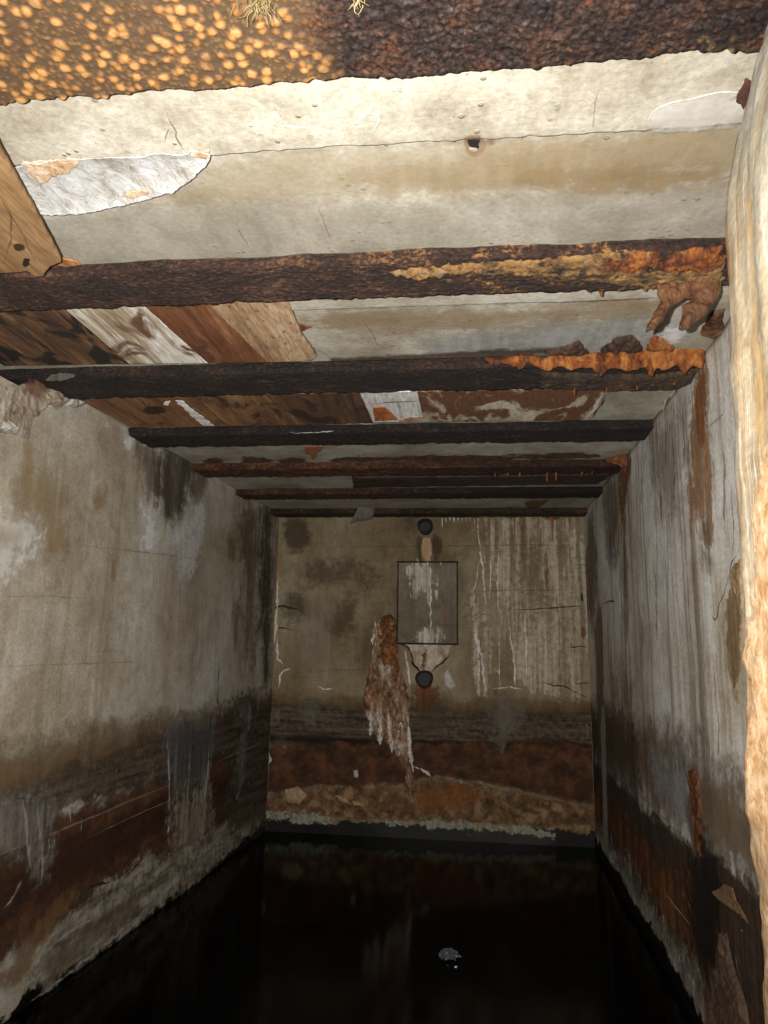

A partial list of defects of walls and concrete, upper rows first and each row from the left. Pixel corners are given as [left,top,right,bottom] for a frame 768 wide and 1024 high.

peeling [15,149,210,216]
spalling [0,380,86,439]
corrosion [242,446,323,463]
corrosion [330,453,600,477]
corrosion [688,362,714,566]
leakage [0,435,768,1024]
corrosion [363,613,431,801]
corrosion [687,767,705,864]